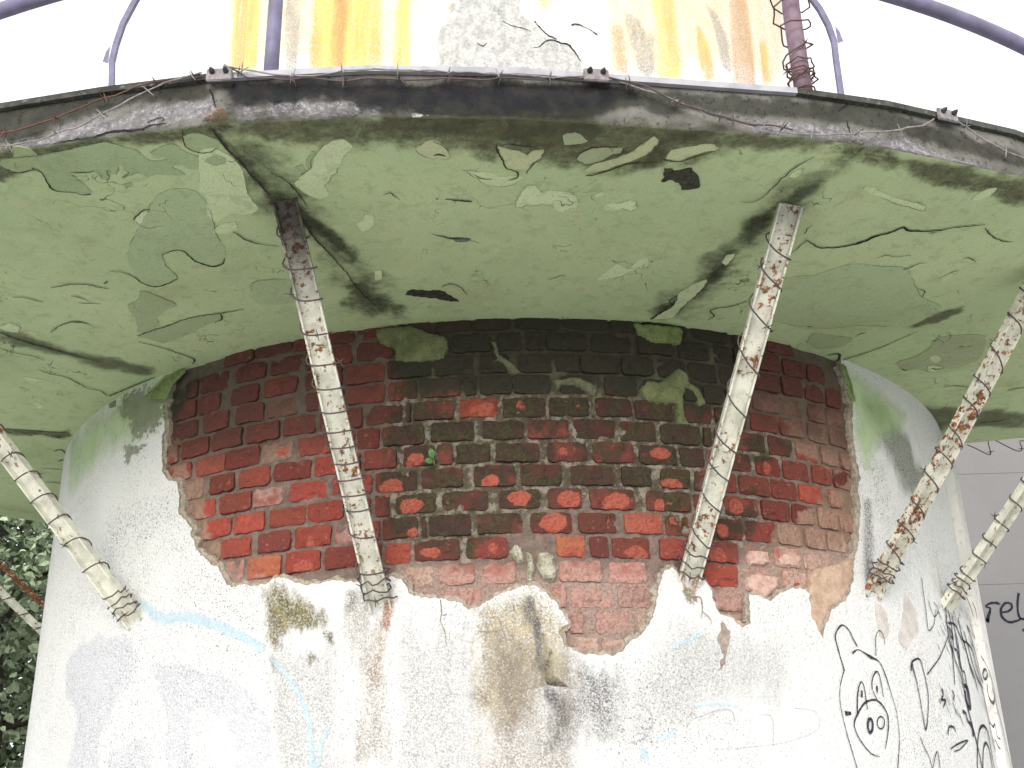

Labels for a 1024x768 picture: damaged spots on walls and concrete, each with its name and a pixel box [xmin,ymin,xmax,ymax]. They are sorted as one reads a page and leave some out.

crack [13,168,93,195]
peeling [0,133,258,234]
crack [58,117,384,313]
damp [0,77,1024,264]
peeling [563,132,719,190]
damp [692,179,823,299]
crack [792,224,1007,298]
spalling [109,339,362,587]
spalling [329,279,742,656]
spalling [702,264,962,669]
damp [266,585,332,646]
damp [475,595,613,768]